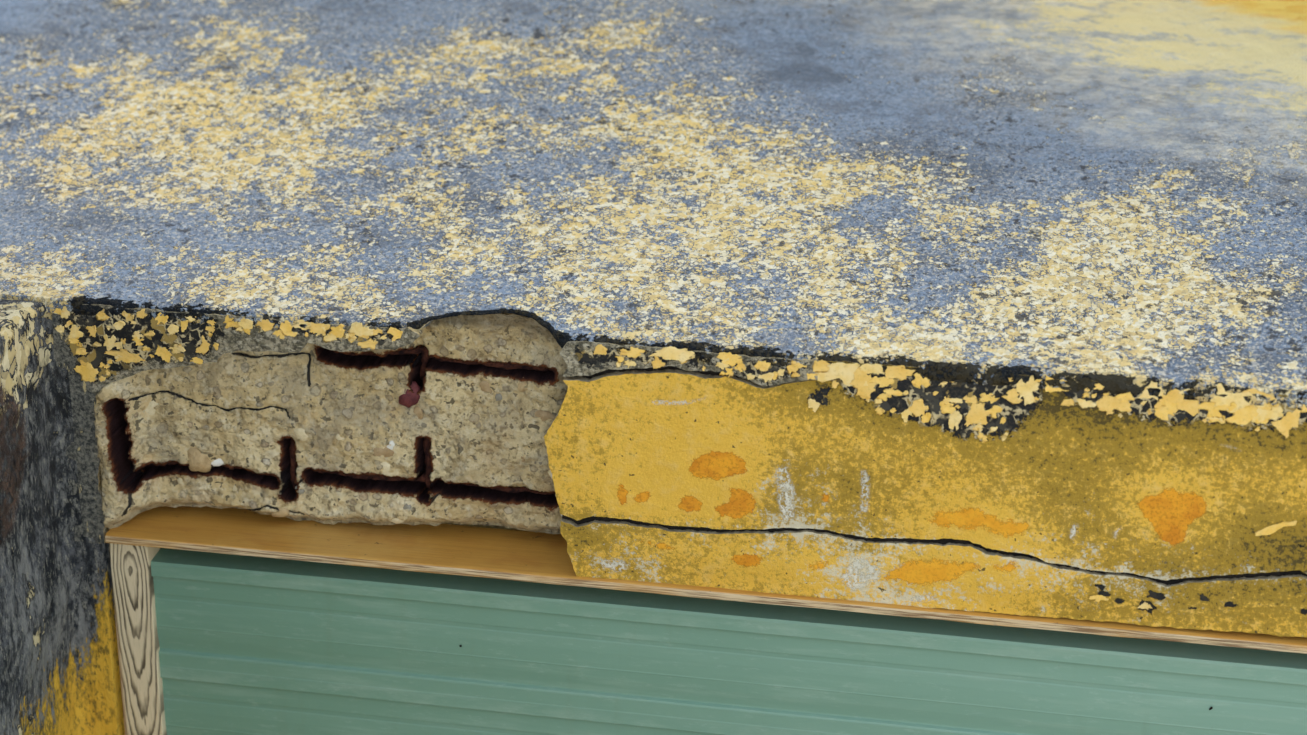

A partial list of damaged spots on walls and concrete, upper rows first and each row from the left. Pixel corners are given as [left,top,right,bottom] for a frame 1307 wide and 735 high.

crack [128,391,290,419]
crack [231,352,311,387]
rust [102,398,559,512]
spalling [94,314,568,534]
rust [314,345,559,395]
crack [558,506,1307,585]